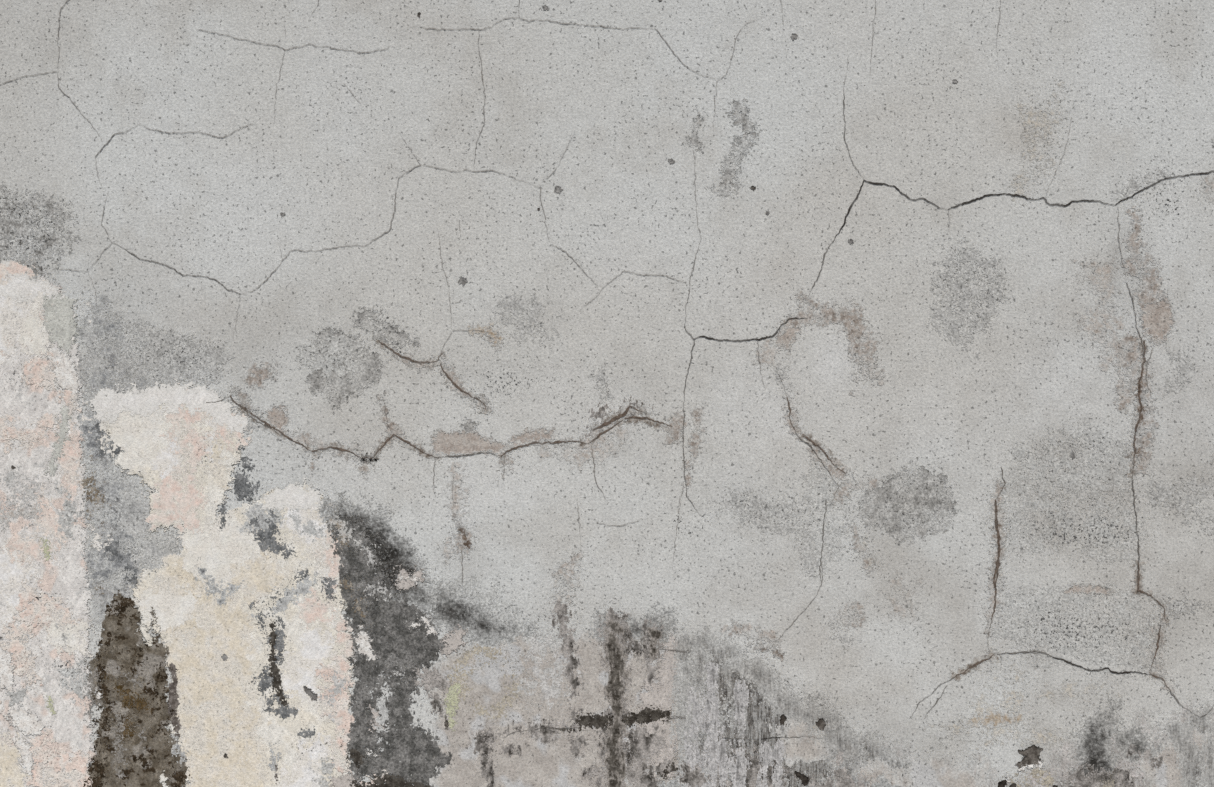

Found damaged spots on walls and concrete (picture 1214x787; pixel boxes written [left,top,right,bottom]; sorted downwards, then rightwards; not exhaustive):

crack [0,0,389,168]
peeling [294,304,420,413]
crack [60,0,854,650]
crack [808,1,1214,719]
water stain [75,283,219,787]
peeling [0,183,358,787]
water stain [544,550,585,618]
peeling [982,418,1214,685]
crack [502,727,580,738]
water stain [655,618,928,787]
flaking render [835,719,1083,787]
flaking render [1107,702,1214,787]